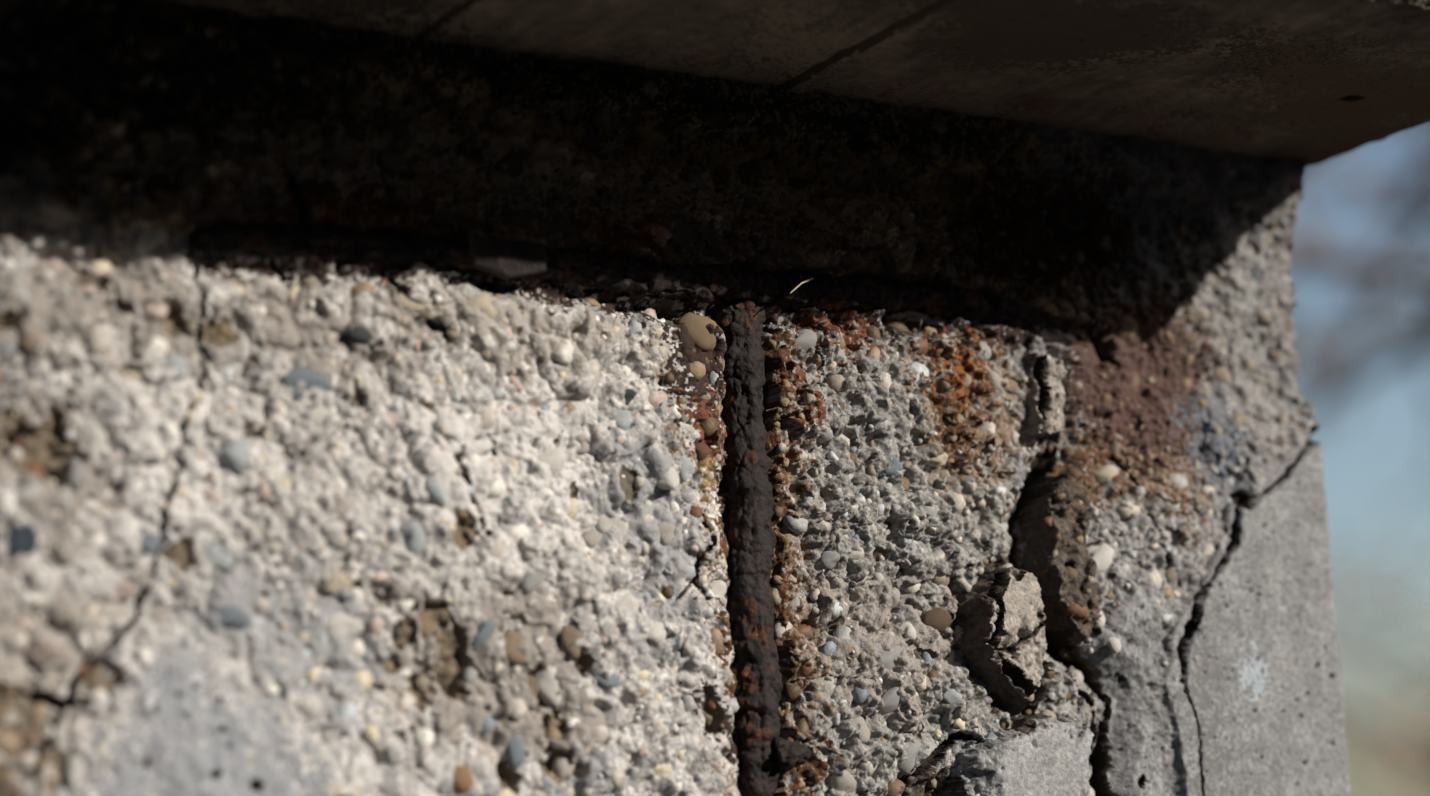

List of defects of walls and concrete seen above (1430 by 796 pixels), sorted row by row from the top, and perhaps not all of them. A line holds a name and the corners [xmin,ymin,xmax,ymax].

crack [13,267,216,795]
water stain [99,360,276,554]
corrosion [175,249,742,796]
water stain [341,372,632,576]
spalling [0,124,1321,796]
water stain [206,0,1394,514]
crack [899,731,987,796]
corrosion [761,277,1234,796]
crack [985,308,1119,796]
water stain [1101,542,1295,796]
crack [1176,427,1317,794]
corrosion [1182,24,1430,167]